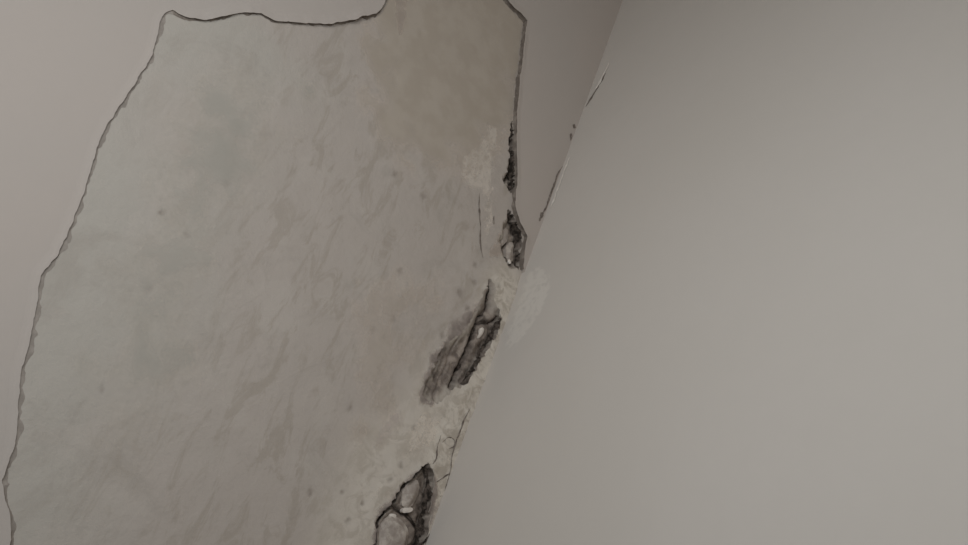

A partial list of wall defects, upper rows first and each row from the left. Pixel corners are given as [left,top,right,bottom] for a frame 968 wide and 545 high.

spalling [0,0,531,545]
crack [539,63,609,221]